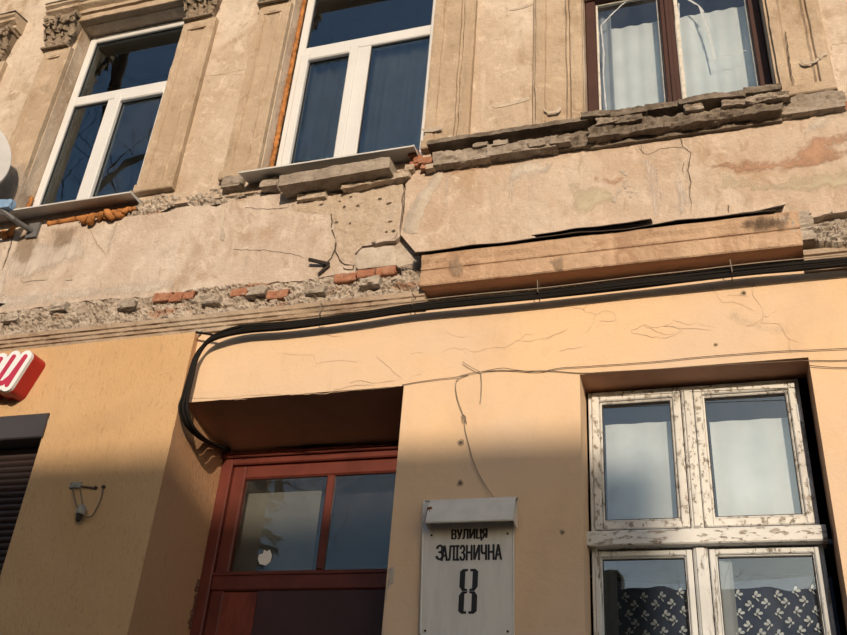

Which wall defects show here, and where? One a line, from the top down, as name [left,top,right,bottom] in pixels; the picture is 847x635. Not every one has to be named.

peeling [580,83,791,127]
spalling [127,175,282,217]
crack [233,214,354,271]
peeling [291,149,437,262]
crack [637,138,692,212]
spalling [791,210,847,250]
spalling [0,262,429,336]
crack [443,302,616,352]
crack [631,320,718,338]
crack [709,283,800,349]